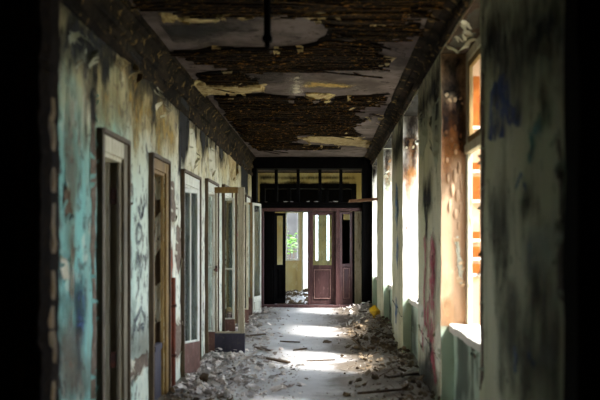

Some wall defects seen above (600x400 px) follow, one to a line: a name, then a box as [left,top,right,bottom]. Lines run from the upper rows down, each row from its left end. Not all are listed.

flaking render [158,13,229,25]
water stain [80,60,109,144]
peeling [154,87,172,119]
flaking render [191,76,267,99]
flaking render [306,93,336,104]
water stain [434,90,464,149]
peeling [189,129,200,170]
flaking render [298,132,372,150]
water stain [66,117,81,219]
rust [403,140,417,200]
flaking render [131,351,148,383]